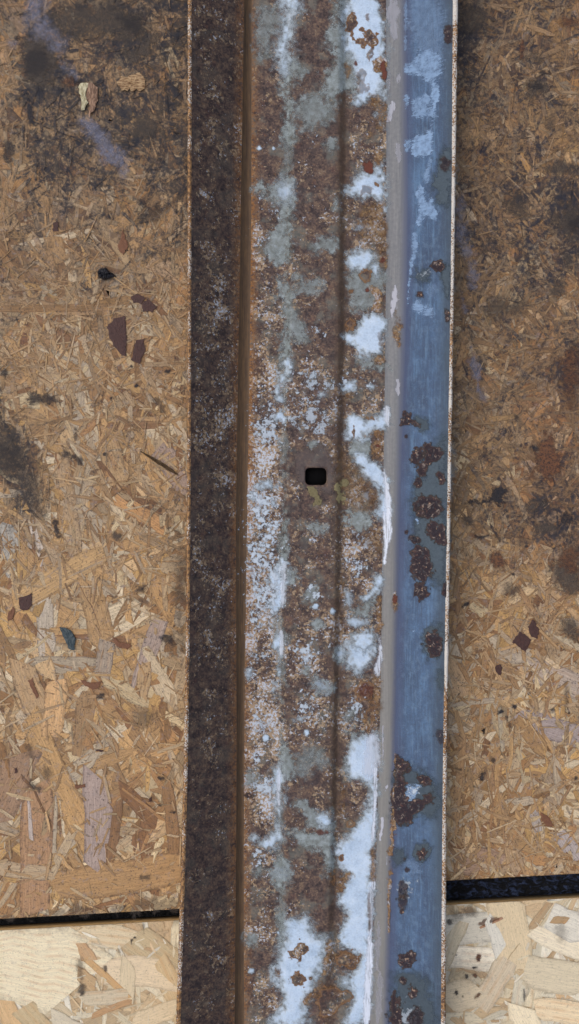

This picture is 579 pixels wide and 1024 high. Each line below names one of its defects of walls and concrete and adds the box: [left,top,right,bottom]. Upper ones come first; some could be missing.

rust [344,12,388,80]
rust [371,95,387,132]
rust [363,150,382,187]
rust [349,202,388,313]
rust [366,416,384,460]
rust [399,410,453,603]
rust [375,592,398,631]
rust [421,622,449,690]
rust [329,854,351,894]
rust [370,754,443,933]
rust [275,938,362,1019]
rust [385,950,437,1024]